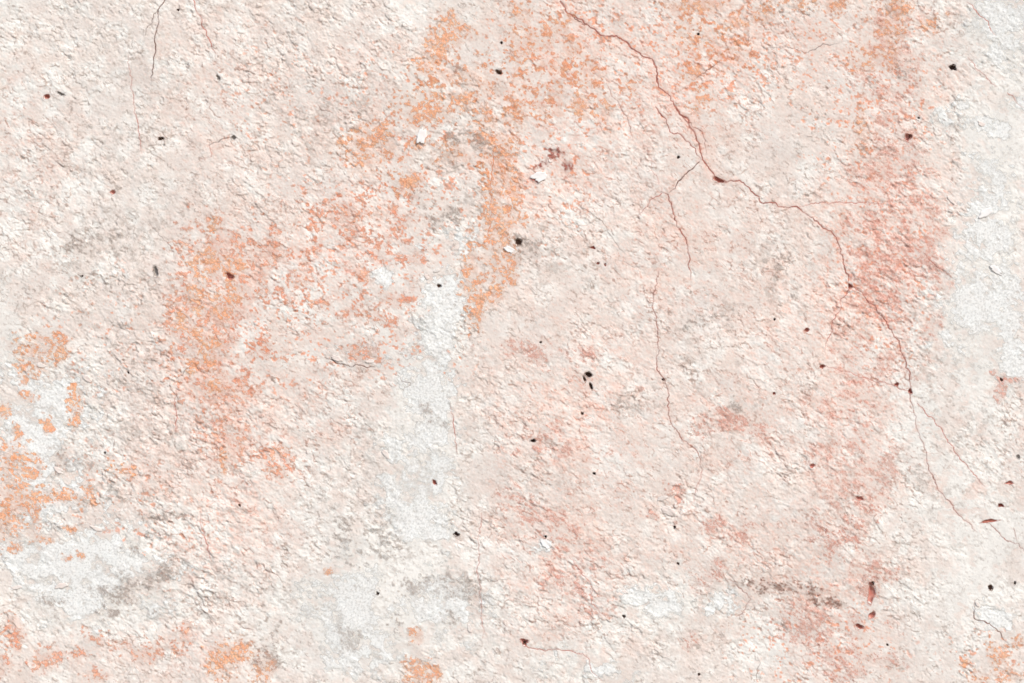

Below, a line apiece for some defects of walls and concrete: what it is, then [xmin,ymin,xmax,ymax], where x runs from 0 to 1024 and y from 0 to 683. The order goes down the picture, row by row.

crack [147,0,165,76]
peeling [405,127,427,150]
crack [560,1,977,477]
peeling [0,332,205,634]